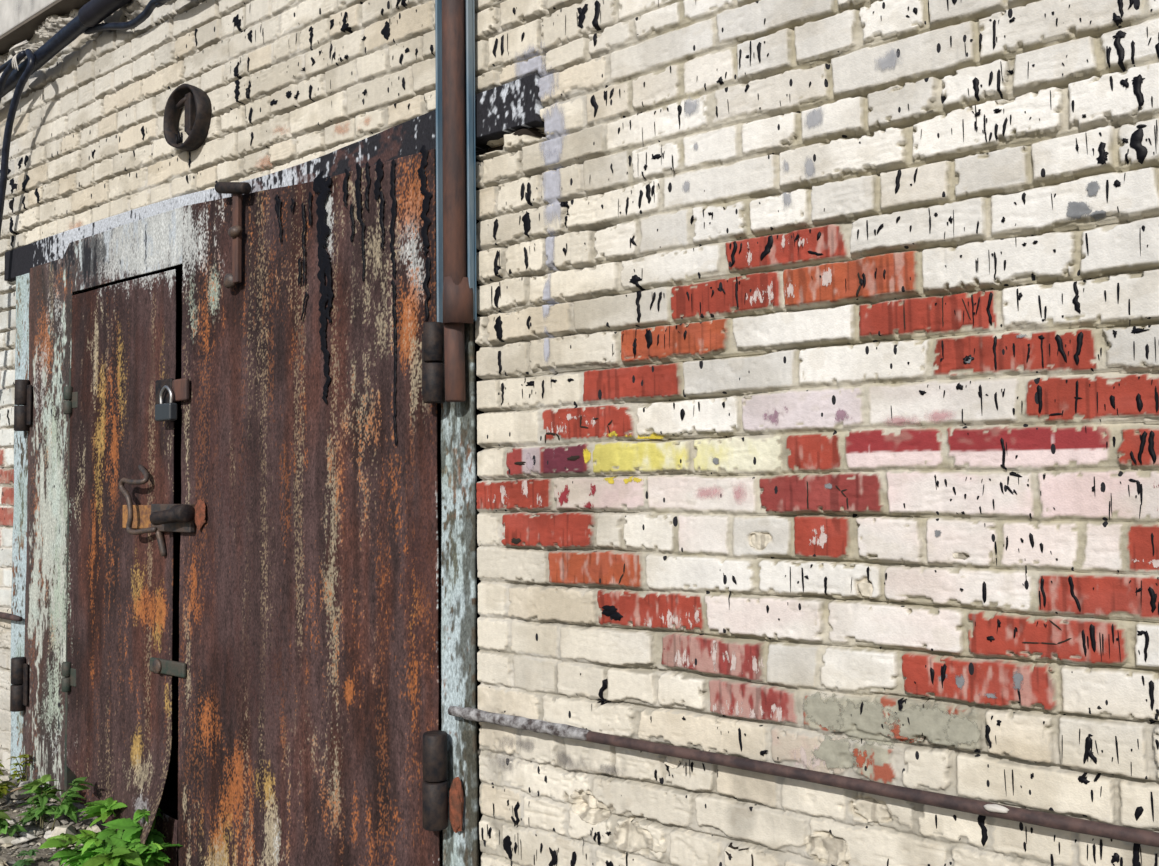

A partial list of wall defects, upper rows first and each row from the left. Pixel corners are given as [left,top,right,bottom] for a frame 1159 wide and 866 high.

peeling [888,711,921,743]
peeling [853,748,872,768]